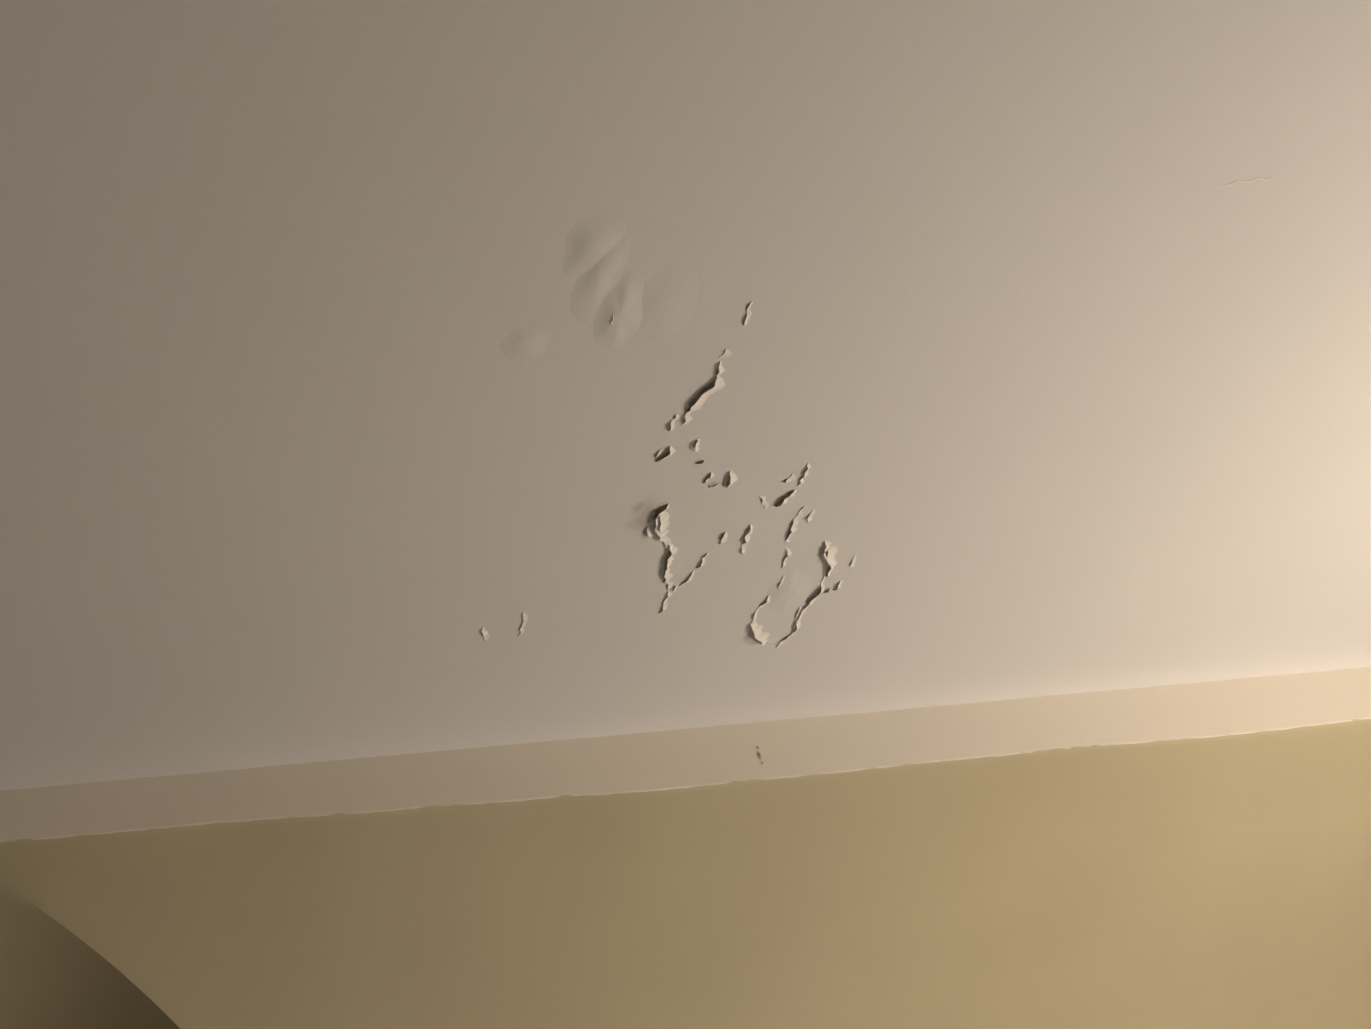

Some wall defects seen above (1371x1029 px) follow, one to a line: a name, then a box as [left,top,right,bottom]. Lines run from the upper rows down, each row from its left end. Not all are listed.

peeling [656,349,732,462]
peeling [647,504,678,614]